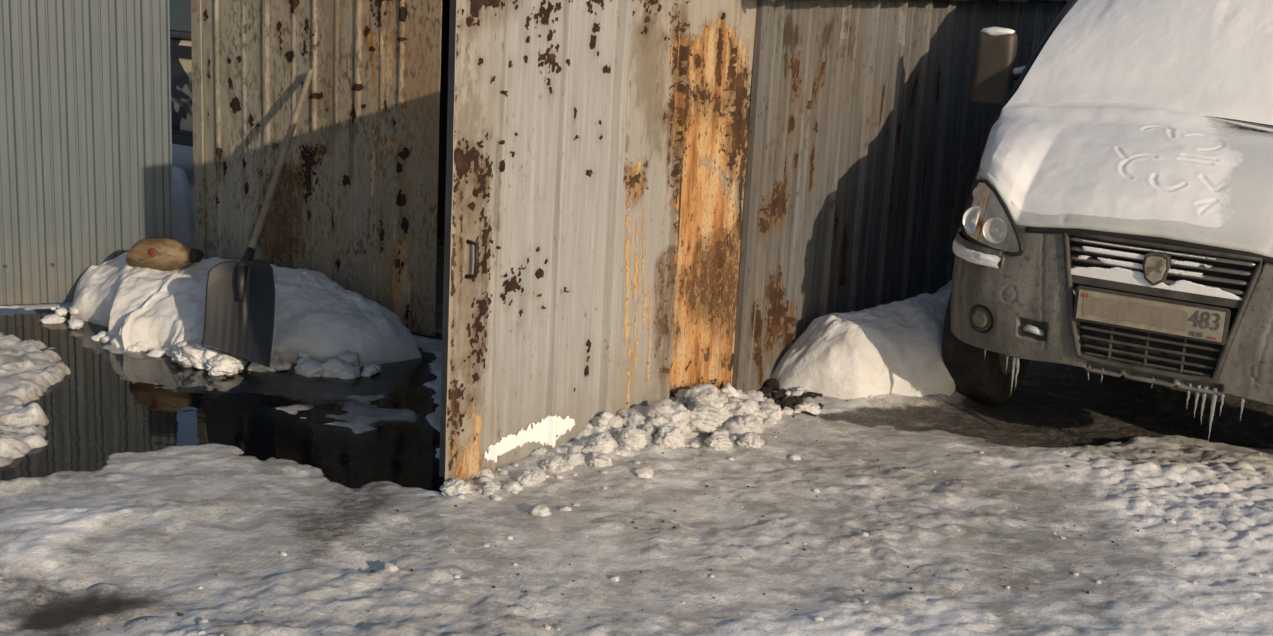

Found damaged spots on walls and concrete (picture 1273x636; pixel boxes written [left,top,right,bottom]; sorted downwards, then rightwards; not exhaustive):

corrosion [227,56,260,127]
corrosion [242,143,328,268]
corrosion [277,0,315,63]
corrosion [350,0,415,331]
corrosion [456,0,612,94]
corrosion [623,0,752,409]
corrosion [757,17,833,234]
corrosion [447,121,548,480]
corrosion [751,264,797,387]